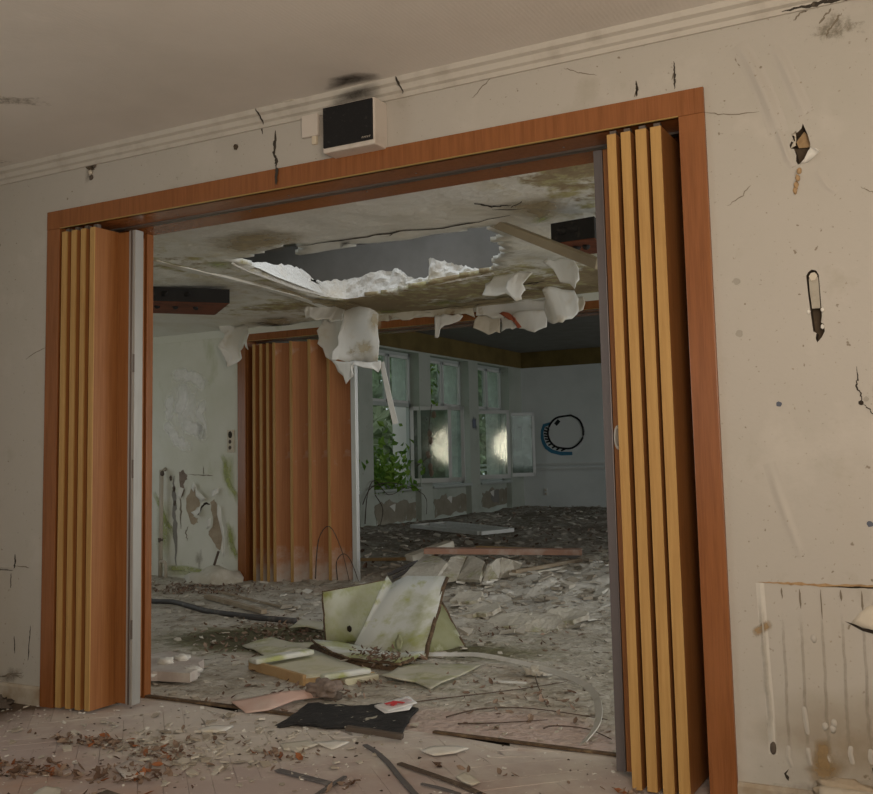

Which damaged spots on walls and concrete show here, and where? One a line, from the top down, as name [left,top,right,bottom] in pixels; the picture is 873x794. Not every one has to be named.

crack [782,0,847,36]
crack [255,108,278,185]
spalling [790,125,820,195]
spalling [231,258,495,299]
spalling [806,270,825,342]
crack [855,366,873,414]
spalling [177,470,224,556]
spalling [374,499,416,526]